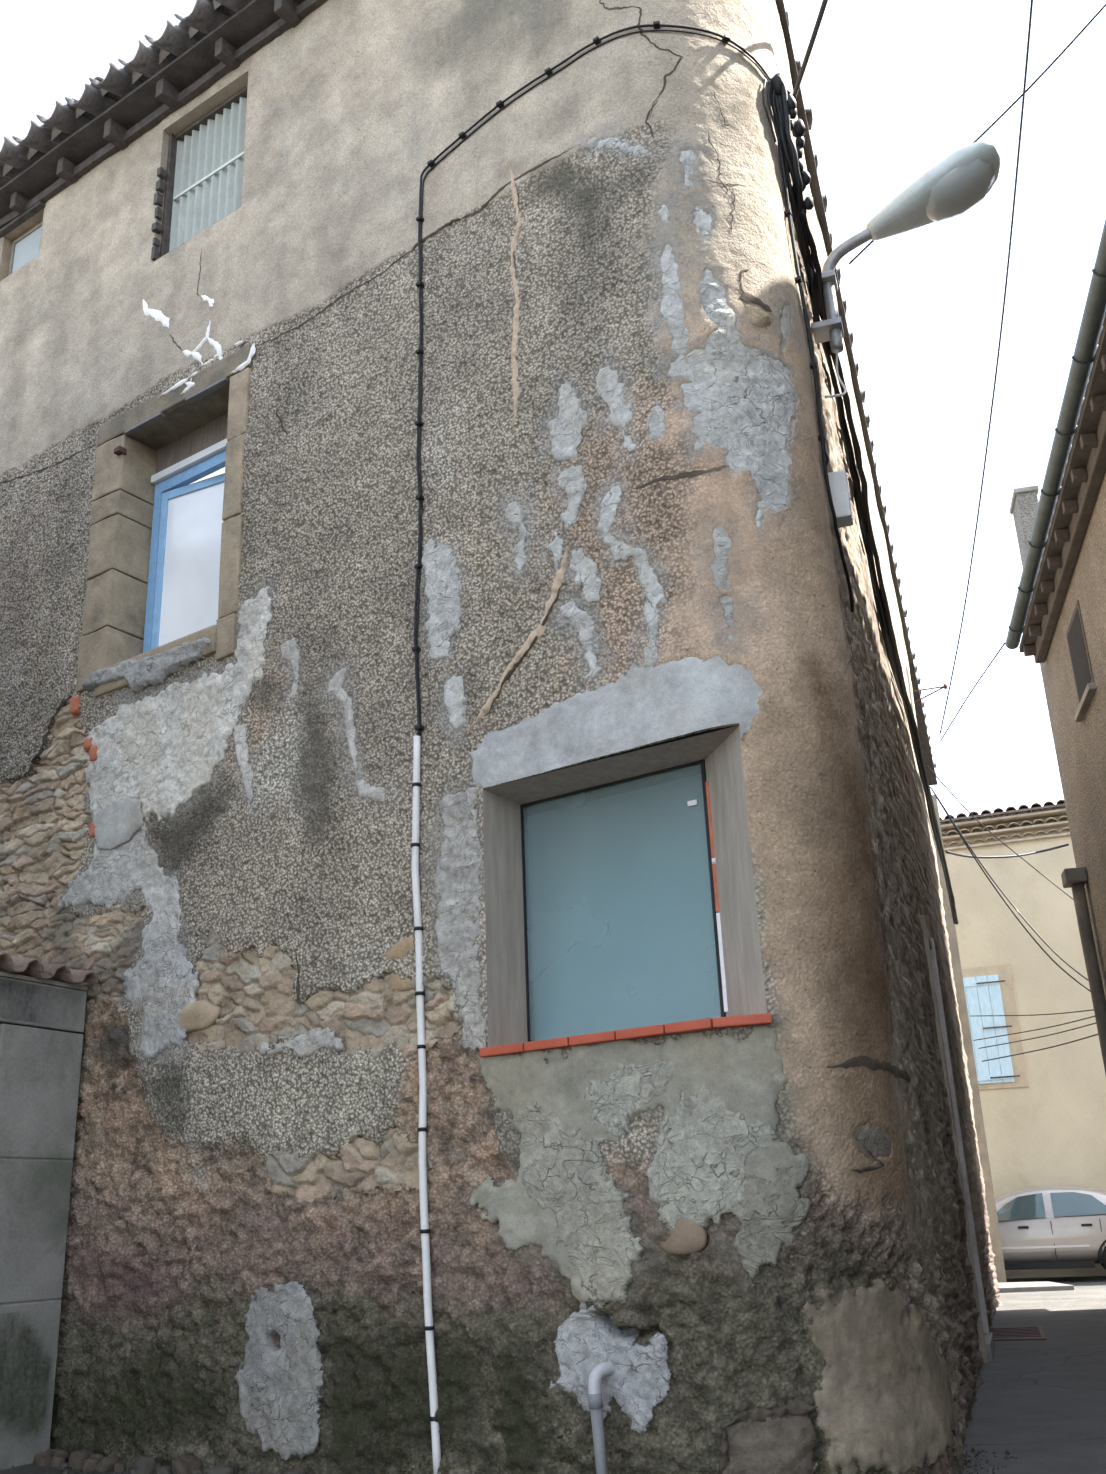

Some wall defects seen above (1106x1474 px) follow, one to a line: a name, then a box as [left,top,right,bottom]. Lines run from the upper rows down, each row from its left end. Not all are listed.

crack [599,0,683,138]
crack [143,144,580,427]
peeling [658,244,798,412]
crack [276,405,287,434]
peeling [548,465,588,571]
crack [468,546,568,731]
spalling [0,696,460,1060]
crack [827,1055,911,1083]
spalling [265,1123,433,1203]
peeling [513,1059,811,1308]
leakage [331,1348,472,1464]
leakage [493,1365,545,1469]